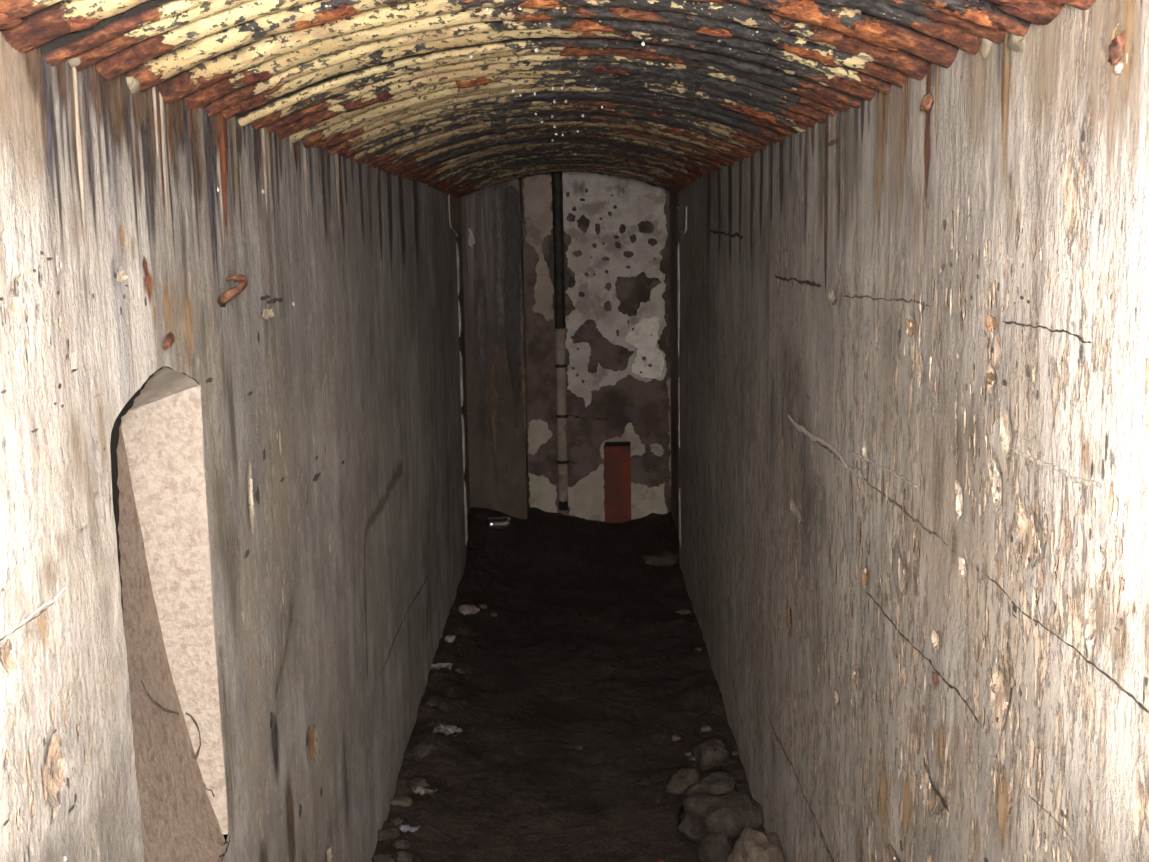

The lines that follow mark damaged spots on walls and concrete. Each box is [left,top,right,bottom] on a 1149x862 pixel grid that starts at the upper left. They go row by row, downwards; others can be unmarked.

corrosion [512,0,616,32]
corrosion [694,26,734,38]
corrosion [763,0,899,51]
corrosion [777,44,839,67]
corrosion [453,77,495,88]
corrosion [344,91,394,113]
crack [775,275,931,307]
crack [1003,321,1091,343]
peeling [522,171,687,547]
crack [816,441,947,545]
crack [987,576,1149,713]
crack [866,592,984,732]